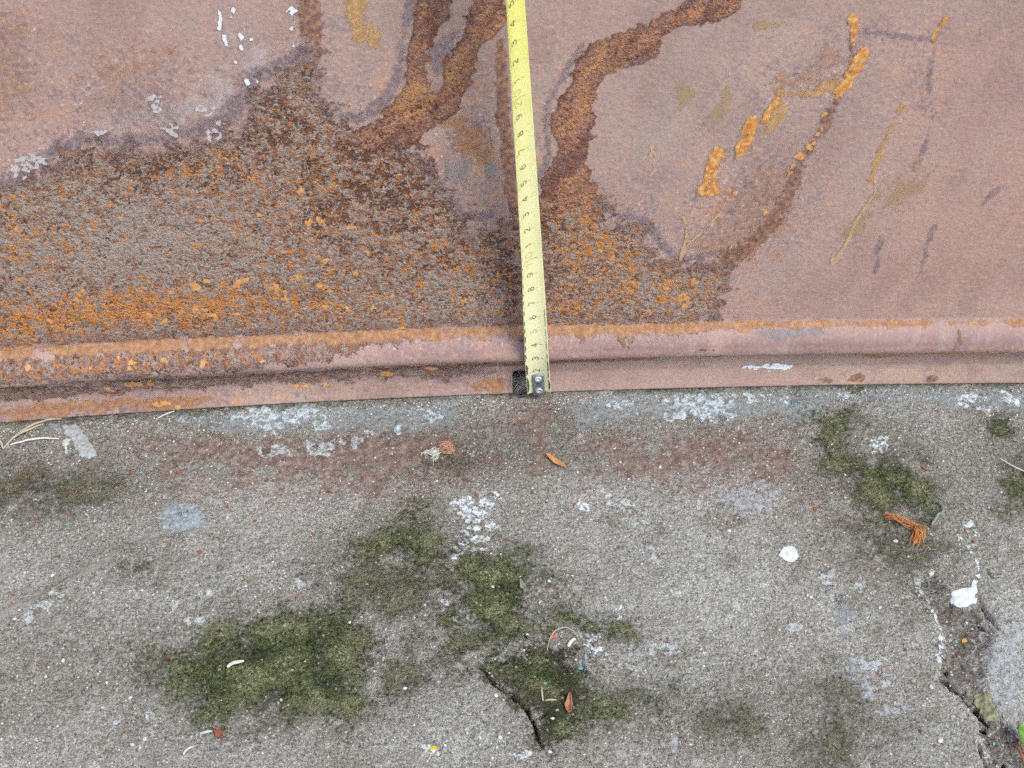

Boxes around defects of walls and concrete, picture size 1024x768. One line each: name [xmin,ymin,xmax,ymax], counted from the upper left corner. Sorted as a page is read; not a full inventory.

corrosion [931,17,950,42]
corrosion [0,0,525,410]
corrosion [539,0,933,364]
corrosion [928,318,1024,354]
water stain [869,436,889,454]
water stain [449,491,500,559]
water stain [574,485,640,528]
water stain [23,588,65,624]
water stain [818,568,865,634]
water stain [577,630,613,693]
water stain [647,643,681,658]
crack [485,674,542,748]